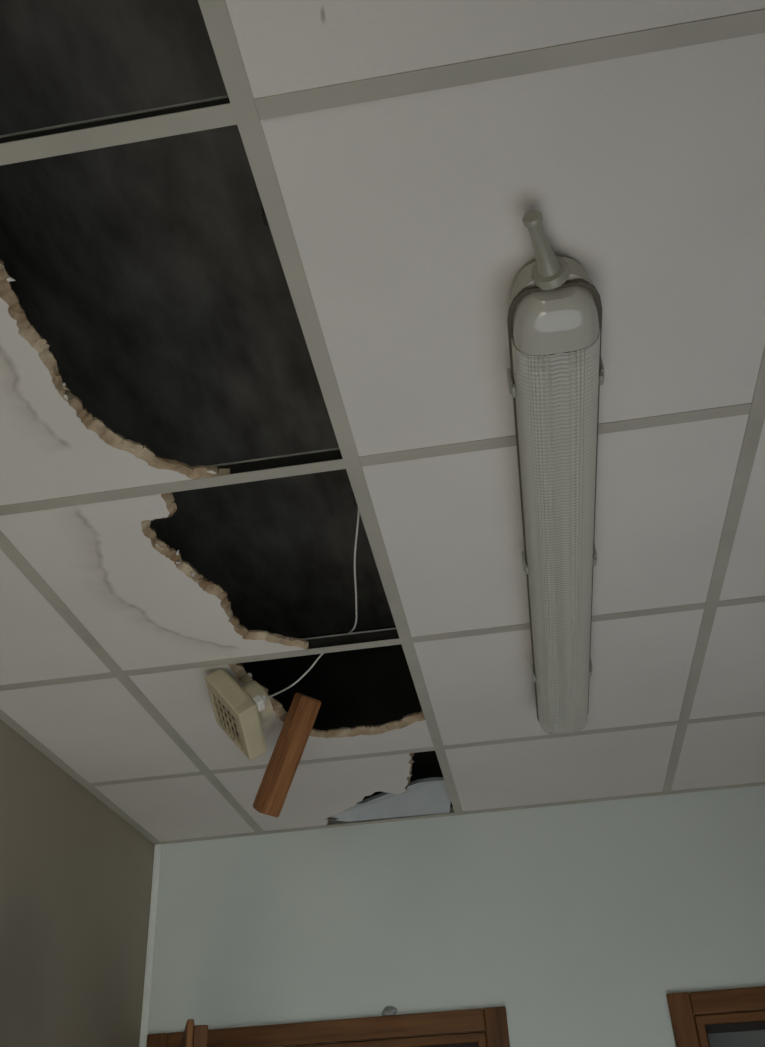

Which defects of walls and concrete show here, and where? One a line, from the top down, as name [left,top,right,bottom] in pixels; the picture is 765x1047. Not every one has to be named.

spalling [0,260,230,479]
spalling [141,493,309,649]
spalling [228,663,287,722]
spalling [309,711,425,738]